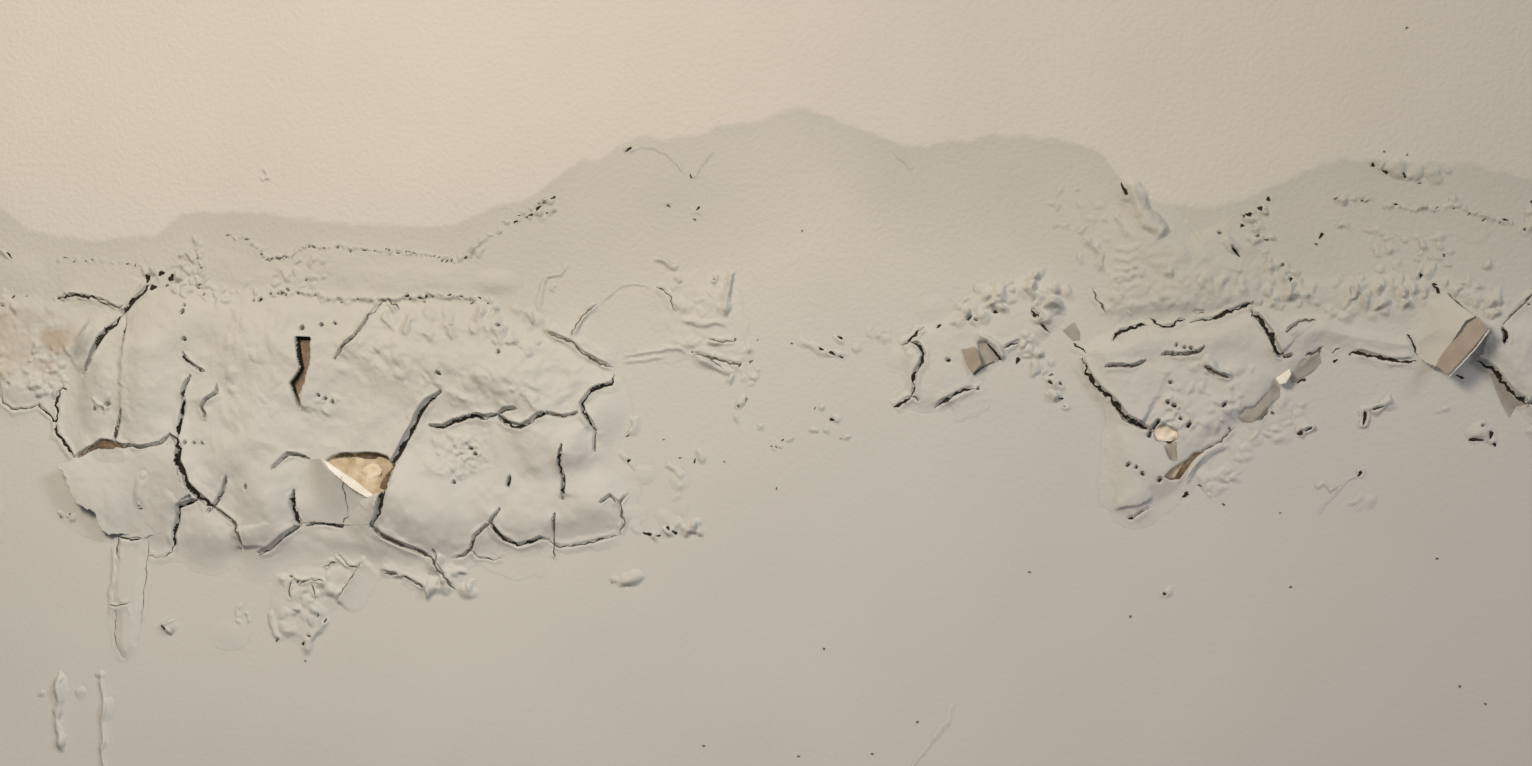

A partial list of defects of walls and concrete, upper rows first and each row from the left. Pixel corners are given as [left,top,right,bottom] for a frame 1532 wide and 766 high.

crack [0,284,628,660]
peeling [0,247,704,603]
crack [894,327,974,408]
peeling [886,267,1532,529]
crack [1005,289,1418,438]
crack [1204,409,1268,450]
crack [1477,295,1532,404]